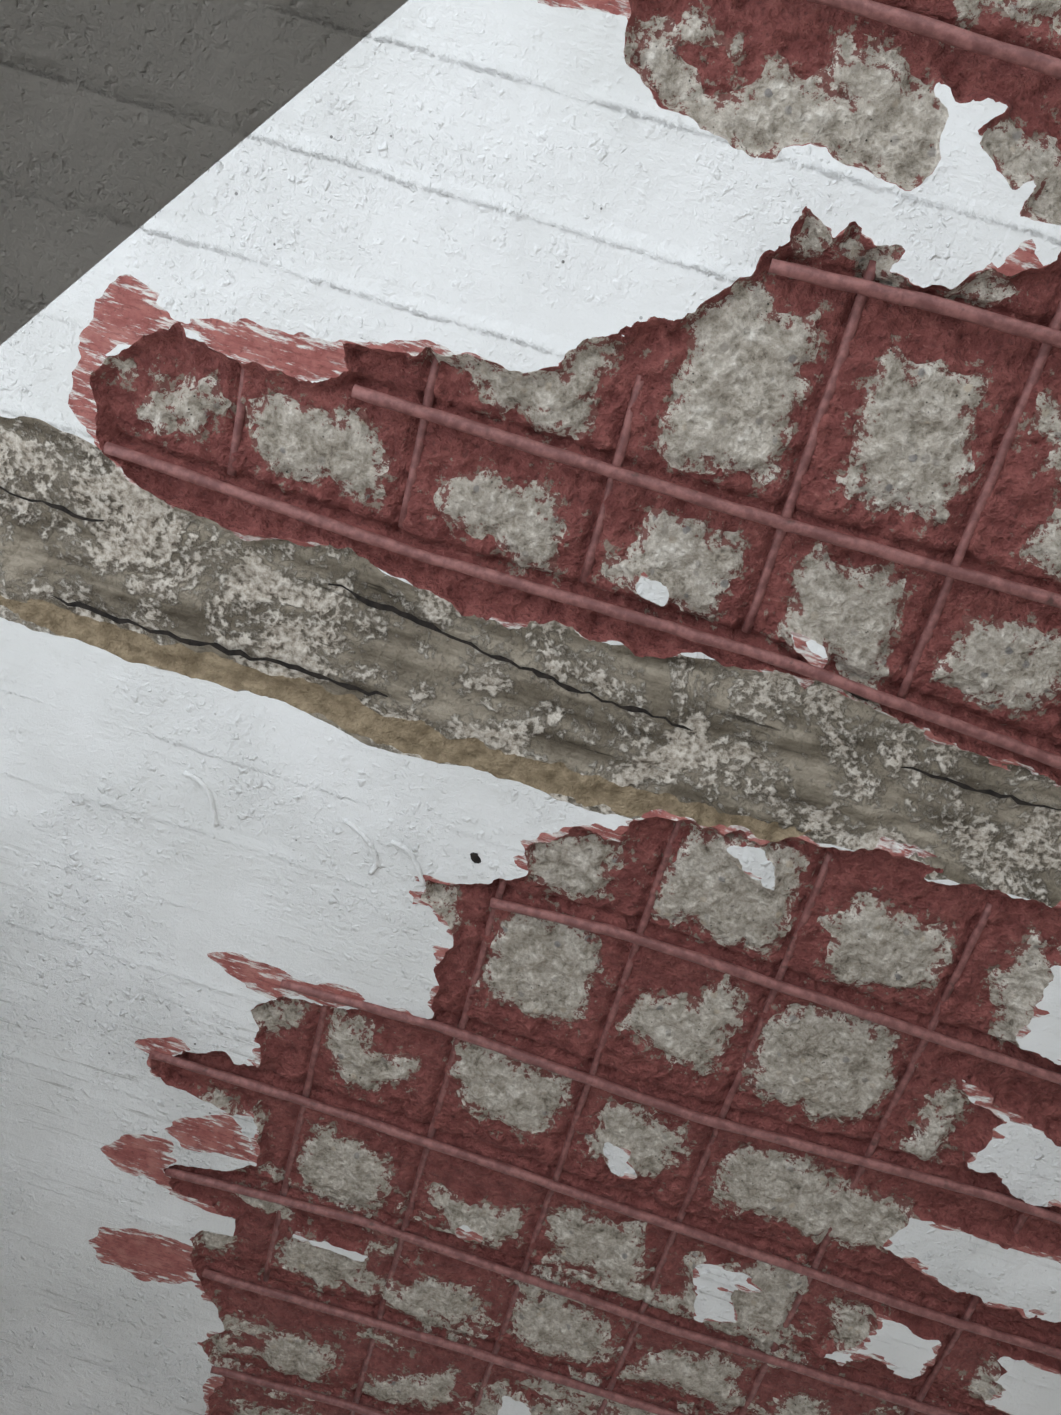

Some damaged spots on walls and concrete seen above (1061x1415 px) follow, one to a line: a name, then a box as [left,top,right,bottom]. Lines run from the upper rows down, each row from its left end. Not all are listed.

spalling [537,0,1061,225]
spalling [0,206,1061,1202]
spalling [89,952,1061,1415]